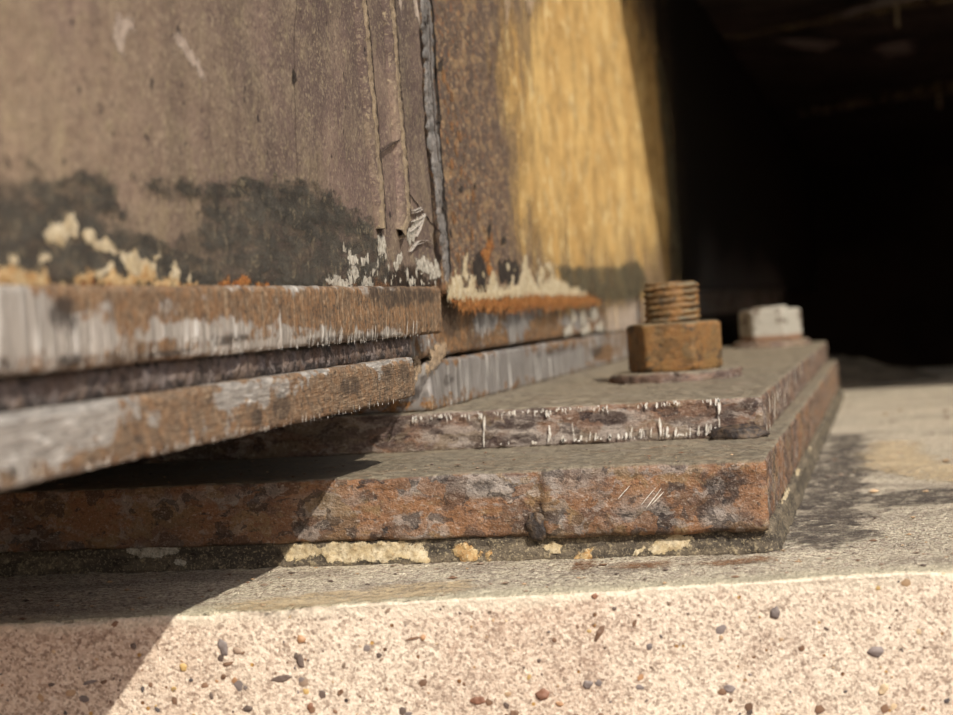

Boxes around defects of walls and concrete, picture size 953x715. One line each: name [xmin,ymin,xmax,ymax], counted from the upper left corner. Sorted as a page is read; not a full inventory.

damp [0,0,682,333]
crack [410,0,453,284]
spalling [473,252,487,290]
spalling [498,257,521,285]
corrosion [438,68,602,318]
corrosion [708,424,770,441]